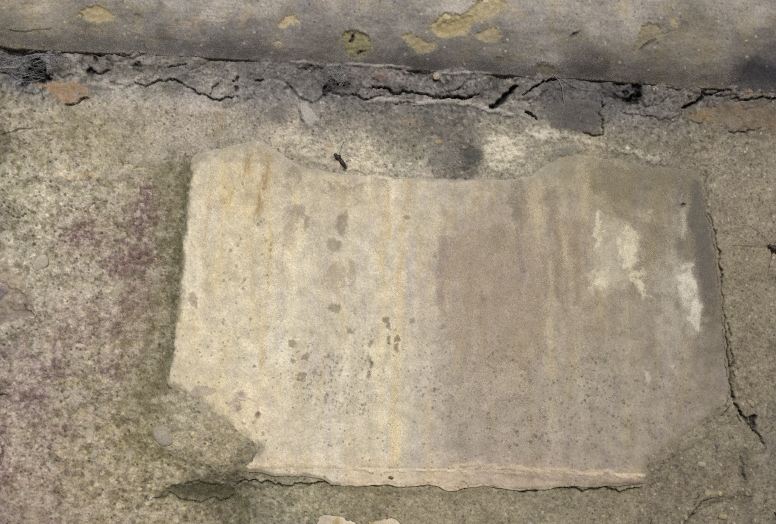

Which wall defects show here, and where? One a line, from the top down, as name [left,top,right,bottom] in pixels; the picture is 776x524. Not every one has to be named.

spalling [75,4,116,24]
spalling [341,29,373,60]
spalling [402,0,507,54]
crack [139,63,264,102]
crack [357,79,555,120]
crack [624,84,776,121]
leakage [735,56,776,93]
efflorescence [485,136,520,170]
efflorescence [533,130,576,140]
leakage [591,163,718,337]
crack [557,485,642,493]
peeling [317,511,356,524]